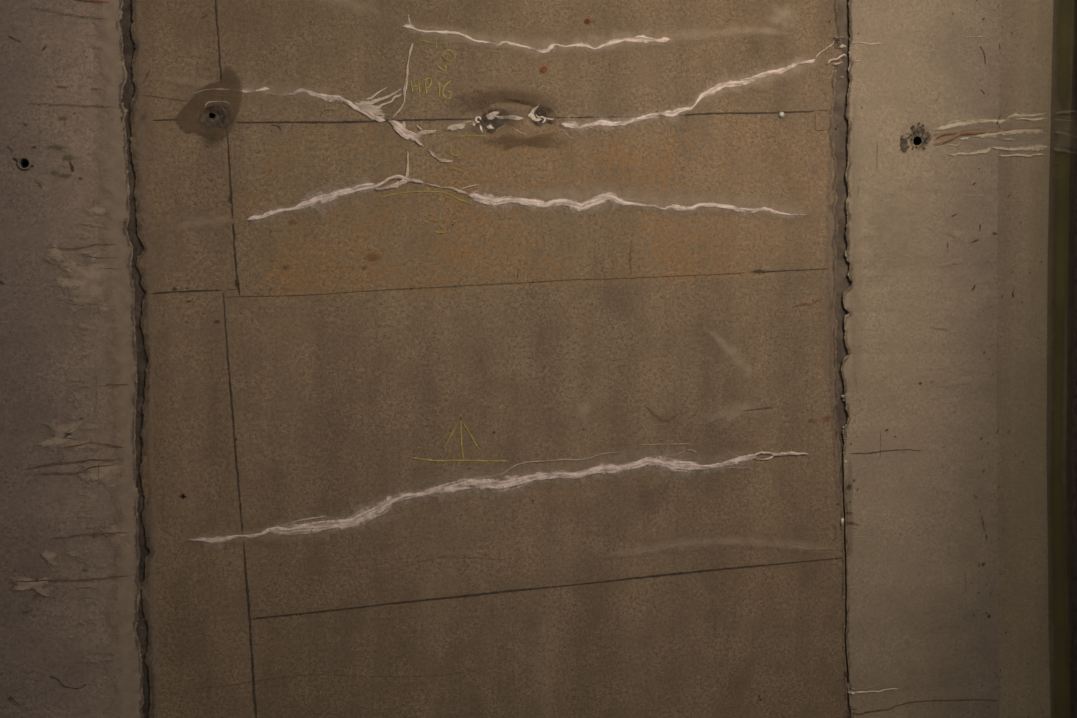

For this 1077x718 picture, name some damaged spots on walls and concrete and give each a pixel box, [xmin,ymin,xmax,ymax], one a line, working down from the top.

leakage [166,6,839,222]